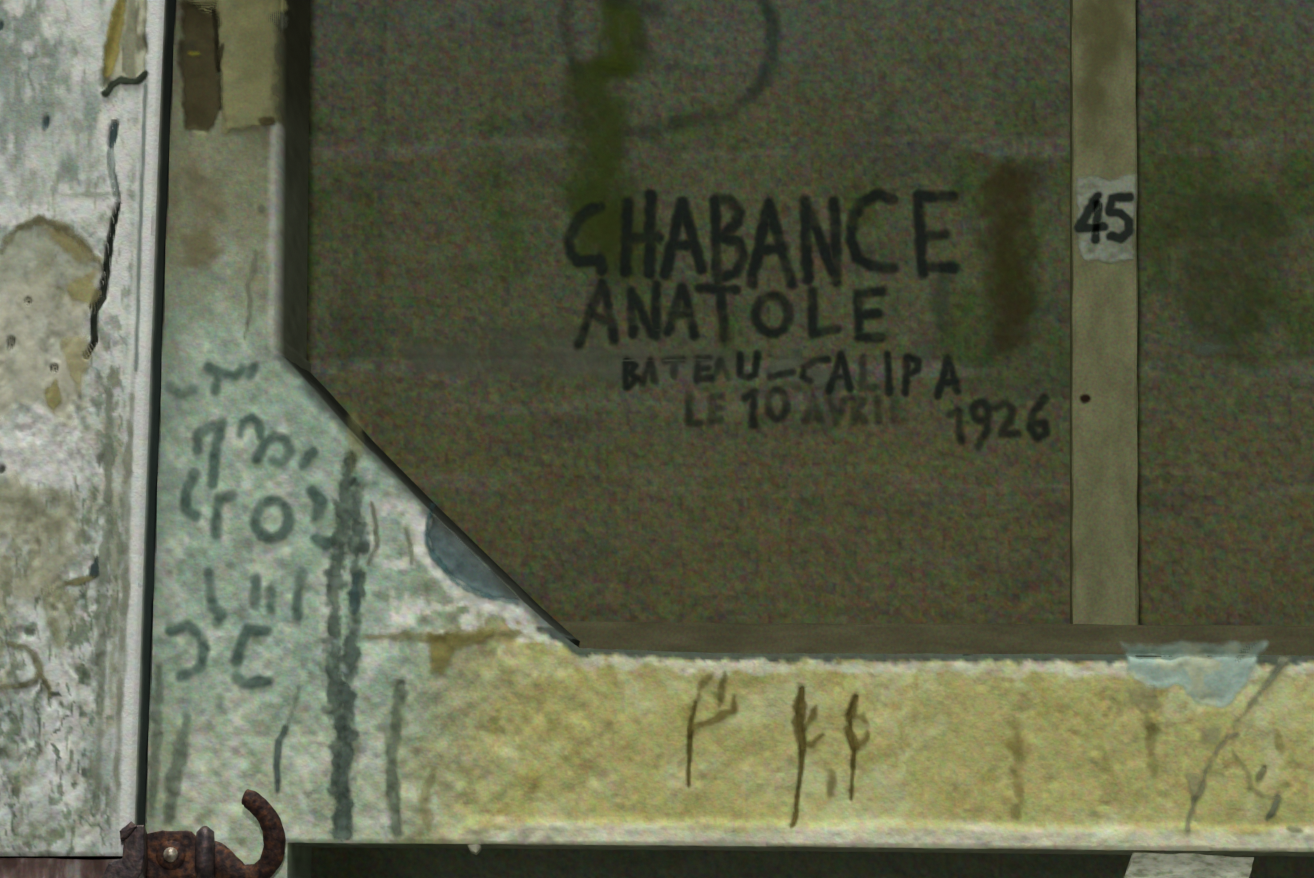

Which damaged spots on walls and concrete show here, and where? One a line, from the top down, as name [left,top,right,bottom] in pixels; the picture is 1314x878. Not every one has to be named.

flaking render [178,1,222,131]
crack [73,84,147,371]
peeling [0,215,100,424]
spalling [1125,641,1267,710]
crack [1185,658,1302,832]